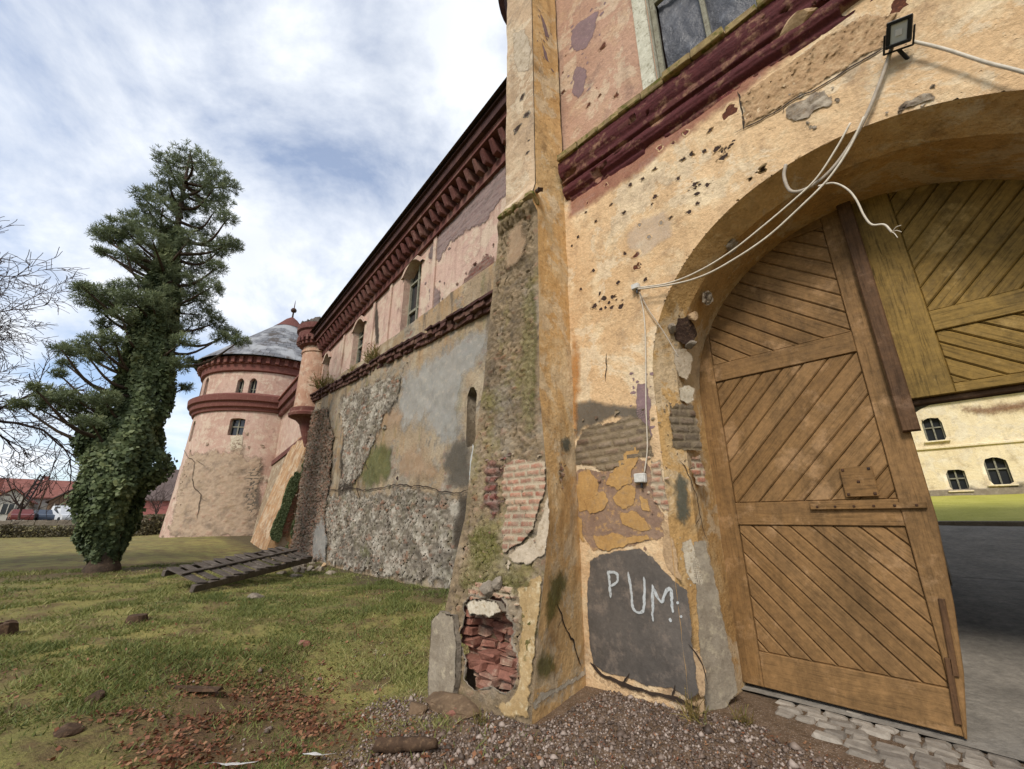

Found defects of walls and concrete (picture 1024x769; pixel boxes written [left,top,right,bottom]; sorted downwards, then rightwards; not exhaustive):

peeling [537,2,621,110]
spalling [786,87,840,129]
peeling [428,167,506,263]
peeling [481,315,707,586]
spalling [428,570,521,696]
crack [557,606,697,708]